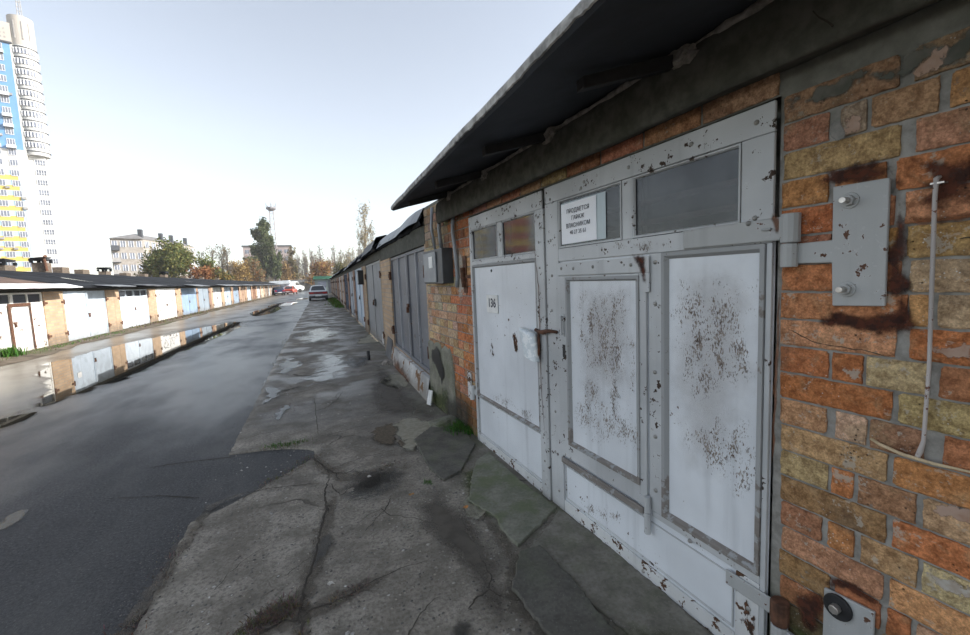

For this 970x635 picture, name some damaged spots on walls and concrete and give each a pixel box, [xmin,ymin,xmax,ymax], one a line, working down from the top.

flaking render [788,29,970,108]
corrosion [820,157,970,335]
crack [249,364,422,635]